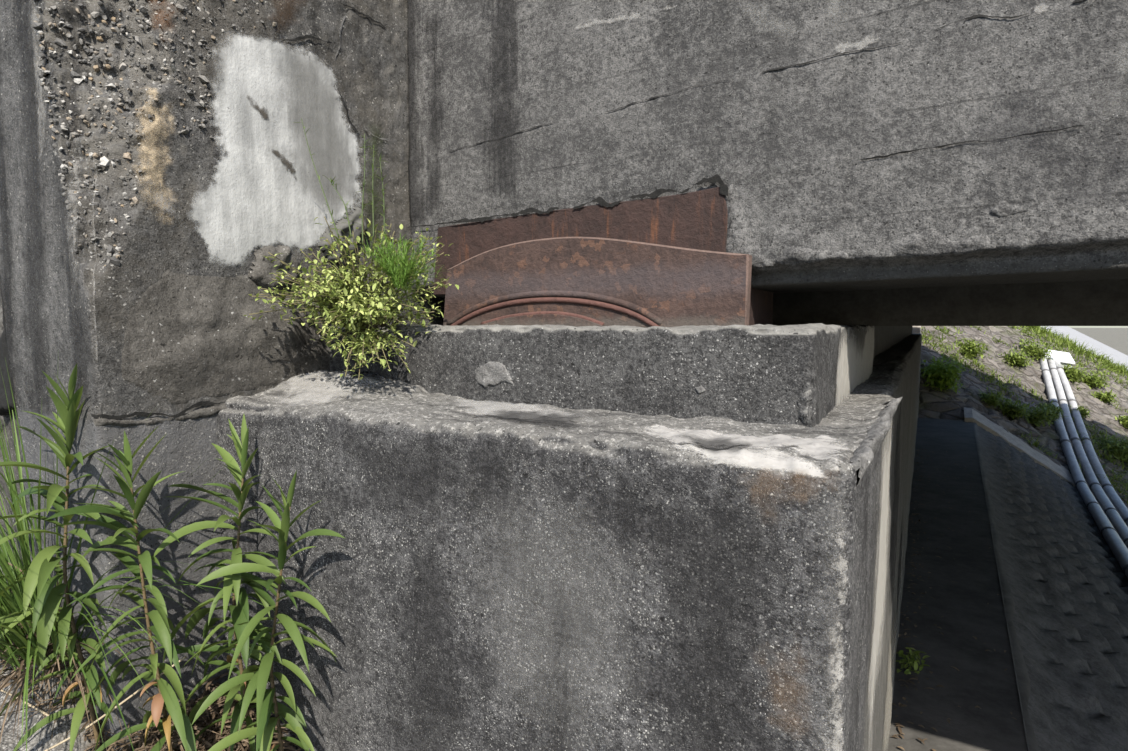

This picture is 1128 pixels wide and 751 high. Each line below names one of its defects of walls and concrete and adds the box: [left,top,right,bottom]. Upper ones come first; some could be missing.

crack [763,13,1029,72]
crack [597,78,731,114]
spalling [32,0,286,272]
spalling [272,150,295,174]
crack [859,125,1086,160]
spalling [317,207,367,266]
spalling [248,245,301,292]
crack [91,401,227,428]
damp [869,422,897,751]